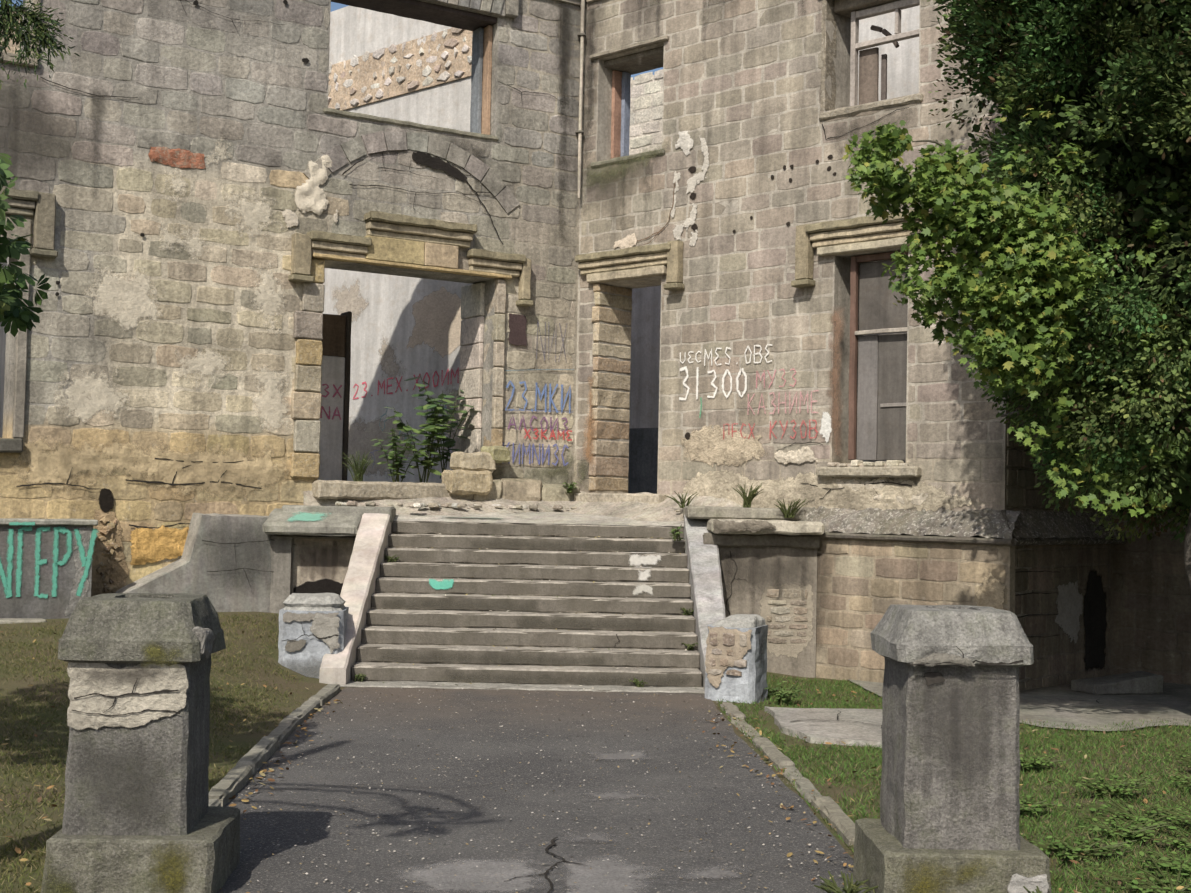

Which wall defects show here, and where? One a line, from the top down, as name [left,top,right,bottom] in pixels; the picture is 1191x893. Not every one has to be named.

flaking render [225,154,338,237]
crack [342,149,504,245]
flaking render [671,131,709,246]
flaking render [379,287,462,378]
flaking render [819,412,832,443]
crack [16,458,262,491]
spalling [680,424,972,534]
crack [72,678,180,716]
peeling [705,626,752,688]
flaking render [759,583,814,658]
spalling [1055,570,1107,671]
crack [506,837,584,893]